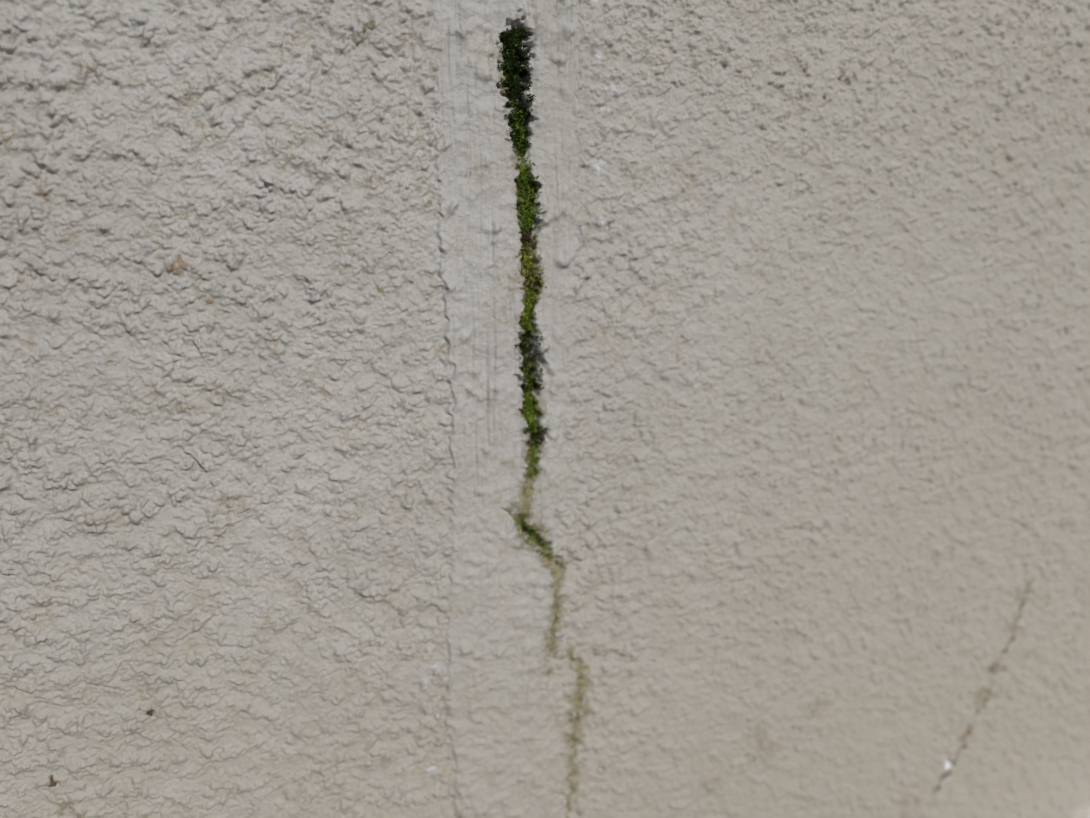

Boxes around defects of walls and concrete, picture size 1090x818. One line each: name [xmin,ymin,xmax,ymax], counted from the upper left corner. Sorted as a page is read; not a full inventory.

crack [501,26,637,765]